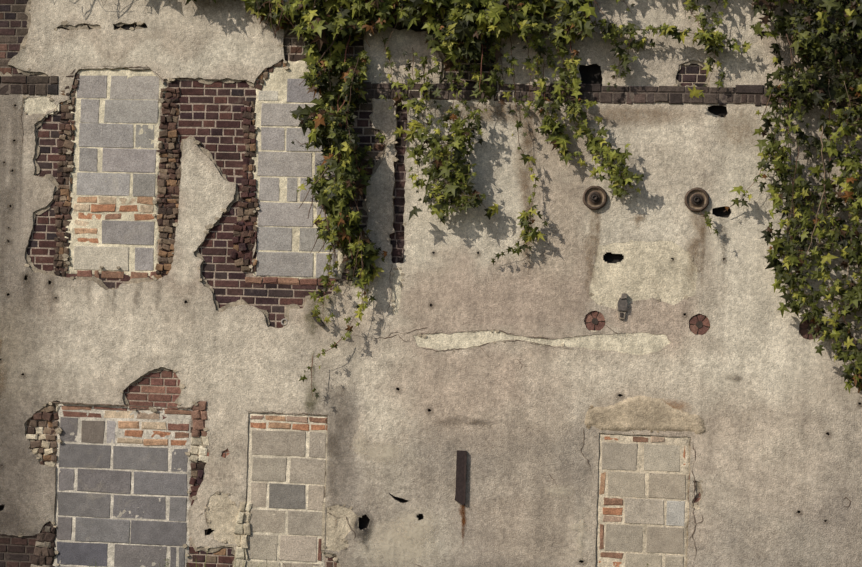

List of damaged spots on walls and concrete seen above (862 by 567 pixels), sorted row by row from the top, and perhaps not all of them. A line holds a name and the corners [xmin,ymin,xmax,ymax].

spalling [0,0,50,79]
spalling [272,20,310,70]
flaking render [387,5,447,31]
spalling [20,76,375,328]
spalling [348,93,408,315]
crack [350,327,584,369]
spalling [25,400,63,467]
spalling [0,521,60,567]
flaking render [321,503,362,567]
crack [689,447,703,564]